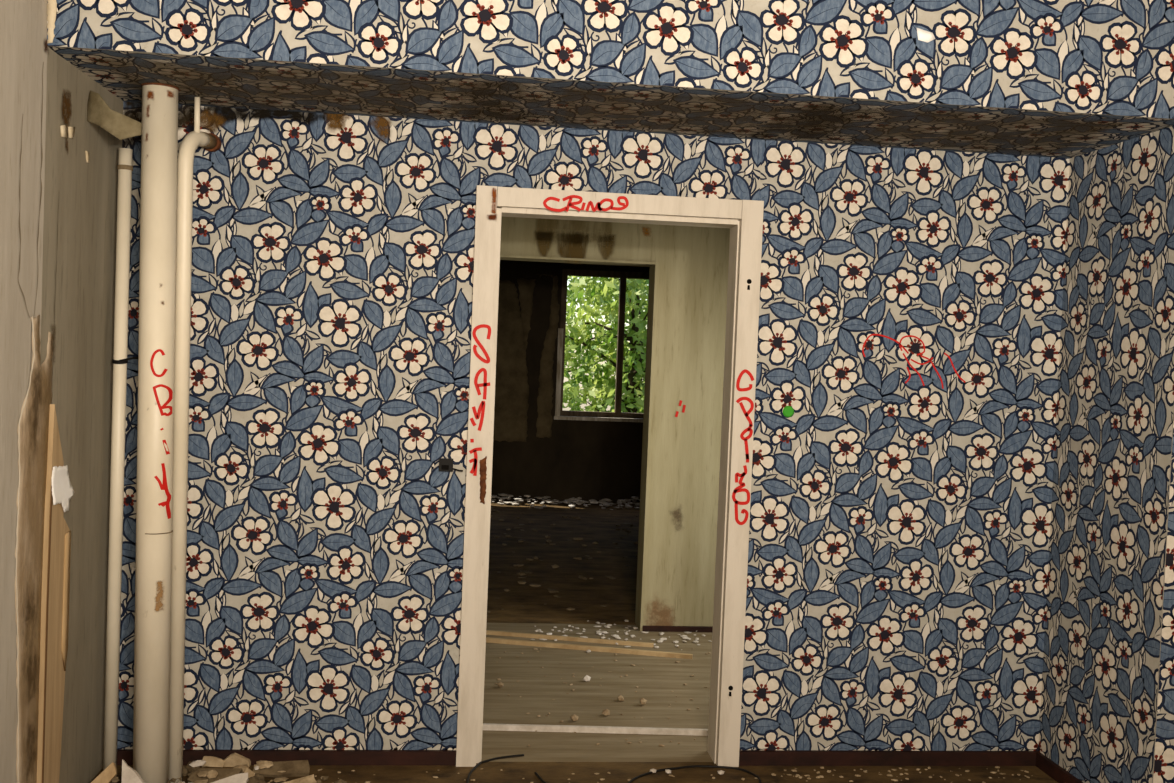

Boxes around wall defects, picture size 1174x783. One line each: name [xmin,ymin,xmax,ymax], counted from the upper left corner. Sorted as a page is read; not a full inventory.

flaking render [47,0,57,43]
peeling [15,315,75,783]